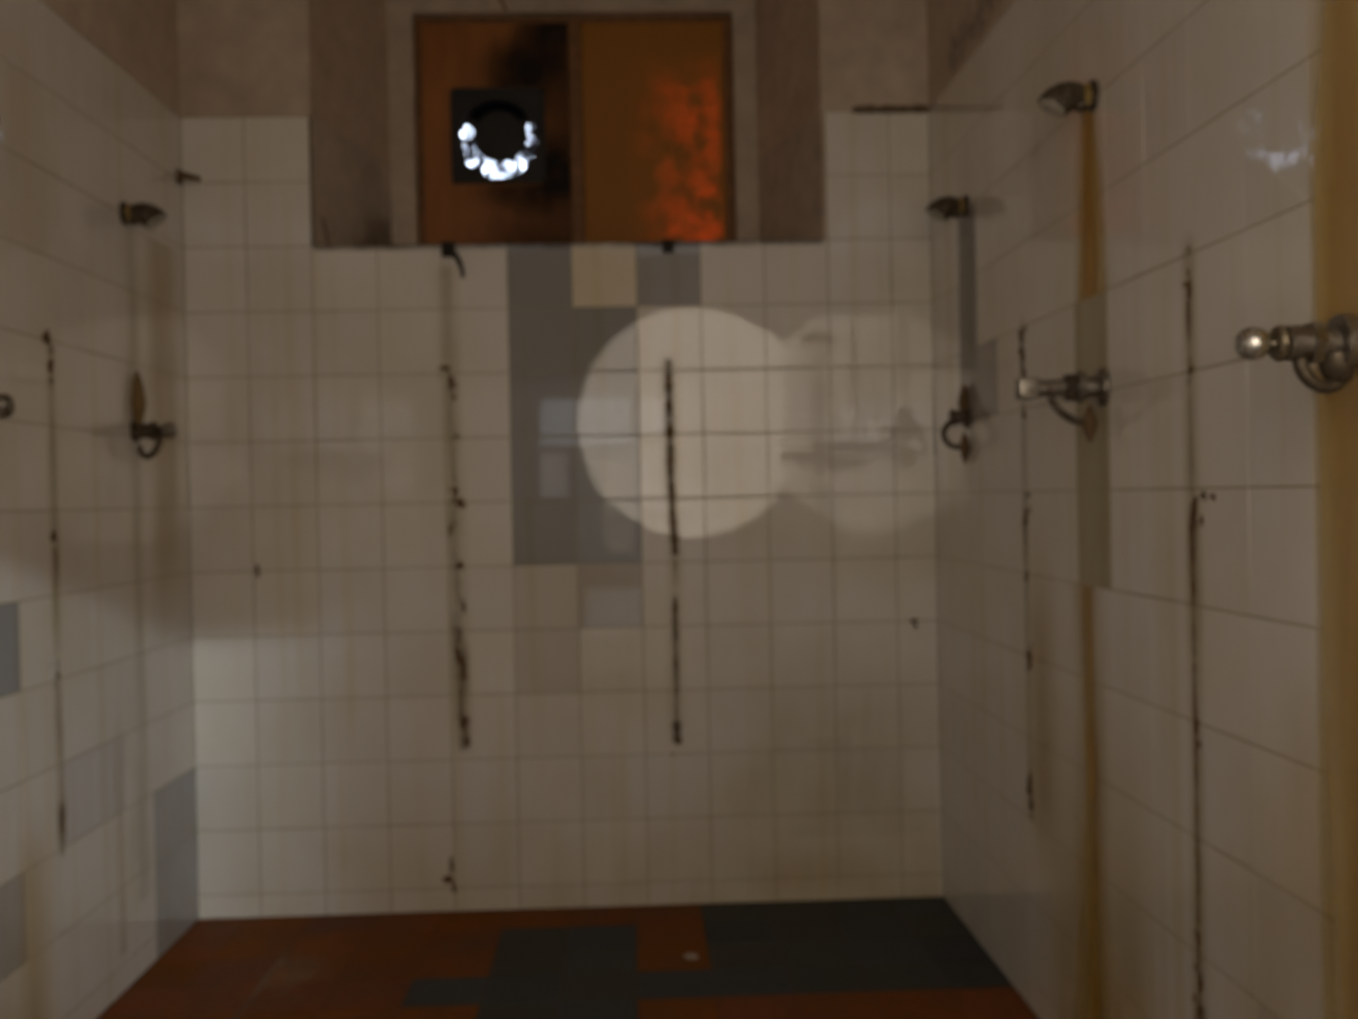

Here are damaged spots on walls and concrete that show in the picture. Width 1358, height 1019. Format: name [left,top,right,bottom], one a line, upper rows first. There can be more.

corrosion [1080,110,1104,301]
crack [1183,245,1192,312]
crack [438,366,461,439]
crack [1018,325,1026,419]
crack [1023,493,1031,530]
crack [448,475,469,682]
crack [664,361,682,756]
crack [1025,643,1033,672]
crack [459,715,471,749]
crack [1190,491,1216,1019]
crack [1026,771,1034,819]